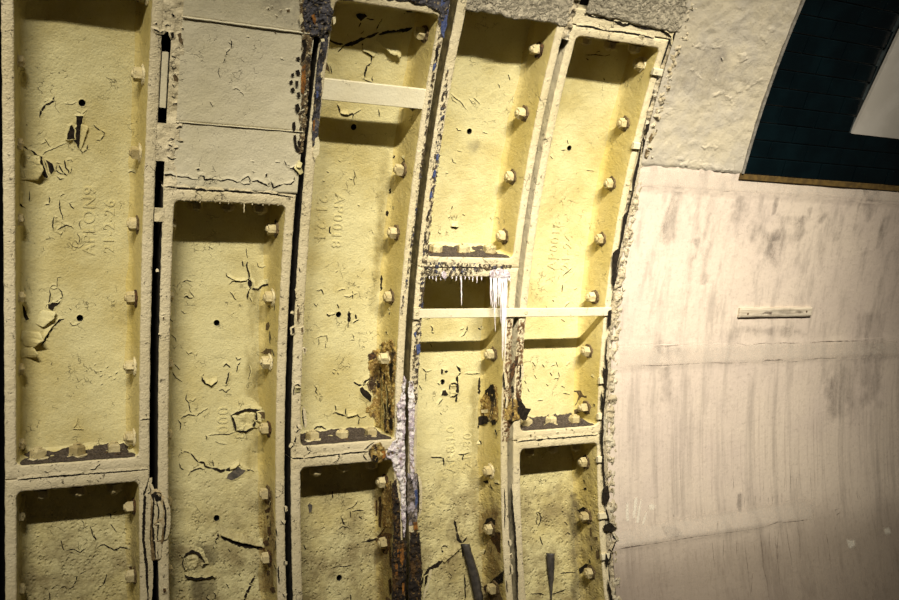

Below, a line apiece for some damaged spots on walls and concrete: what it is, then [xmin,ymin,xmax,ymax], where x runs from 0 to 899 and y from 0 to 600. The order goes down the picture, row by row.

corrosion [289,0,329,160]
crack [361,43,377,83]
peeling [20,113,91,208]
crack [164,170,297,197]
peeling [20,275,66,358]
crack [225,248,268,303]
water stain [425,261,512,279]
corrosion [366,331,397,435]
corrosion [477,356,531,437]
water stain [386,376,415,537]
corrosion [374,473,423,600]